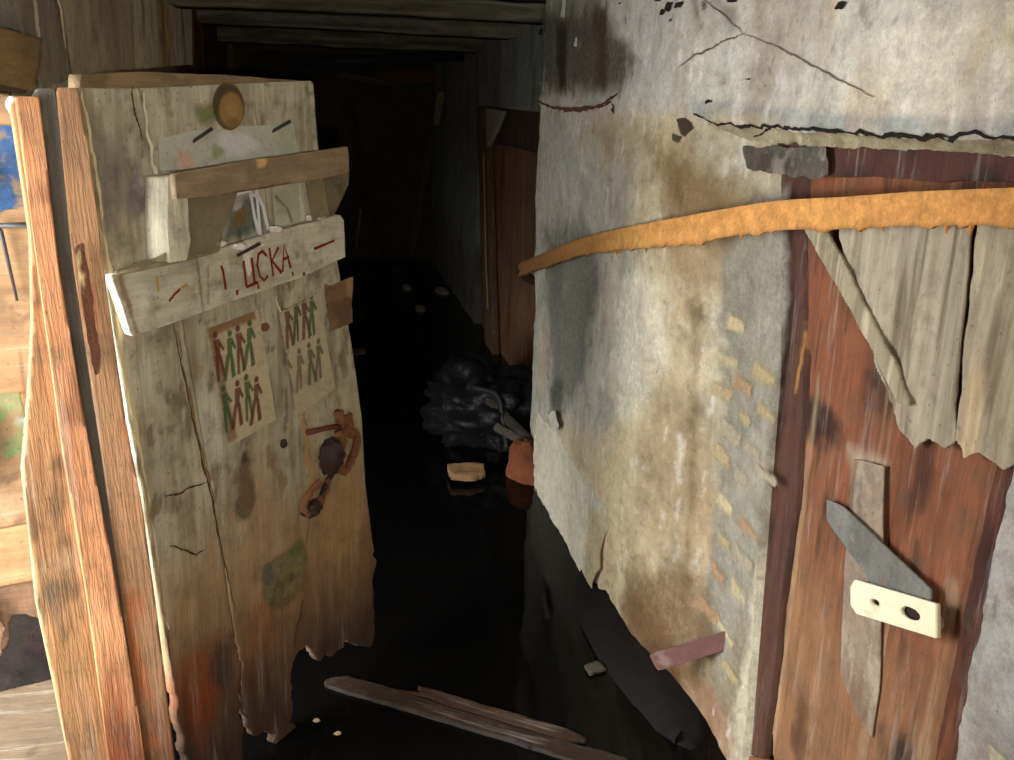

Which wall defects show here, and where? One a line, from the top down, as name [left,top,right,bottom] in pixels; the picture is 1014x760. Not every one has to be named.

crack [679,1,873,97]
spalling [672,118,700,143]
spalling [708,123,1014,180]
spalling [956,472,1014,760]